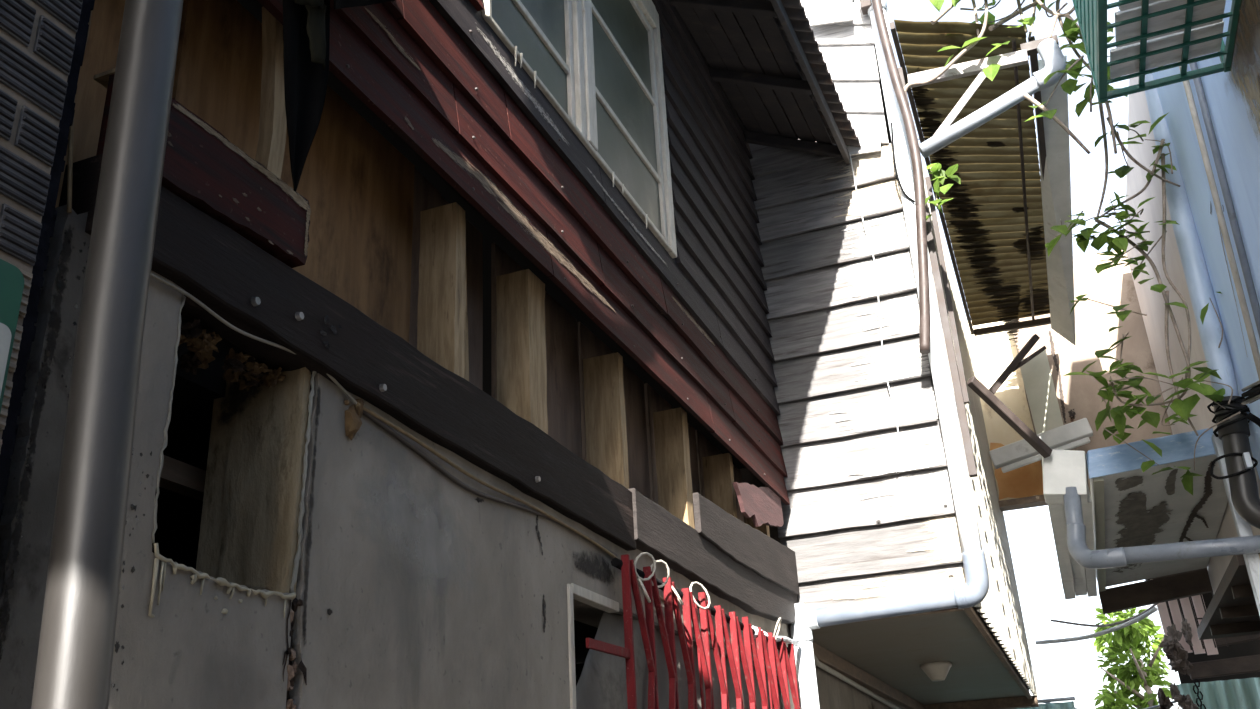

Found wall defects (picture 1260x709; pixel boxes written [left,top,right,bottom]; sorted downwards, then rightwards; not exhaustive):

water stain [1232,0,1260,132]
peeling [825,144,930,383]
spalling [125,296,186,543]
crack [283,385,321,709]
spalling [289,371,317,593]
peeling [830,391,938,432]
peeling [834,441,966,600]